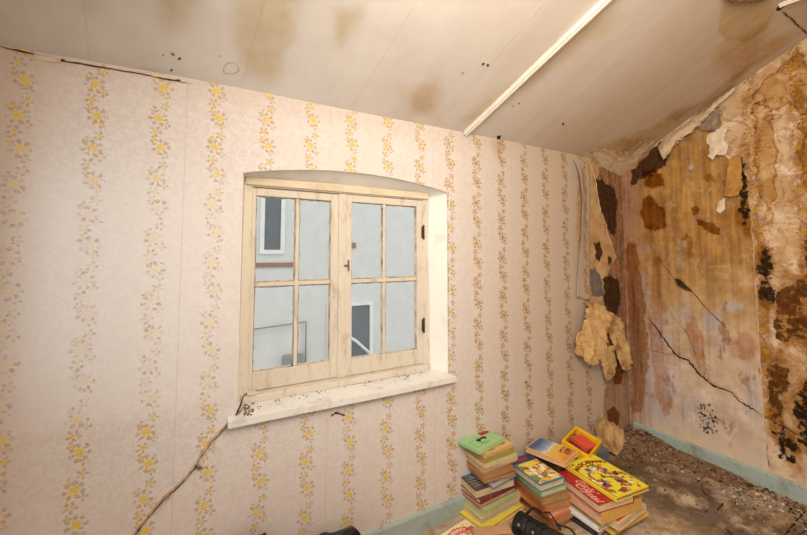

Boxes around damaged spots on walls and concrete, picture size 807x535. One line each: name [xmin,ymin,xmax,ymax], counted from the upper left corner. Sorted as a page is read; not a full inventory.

crack [0,46,186,83]
crack [782,12,807,34]
crack [644,233,722,323]
peeling [575,106,807,486]
damp [756,247,807,342]
crack [648,307,807,439]
damp [766,364,807,464]
crack [132,393,246,535]
crack [784,511,807,535]